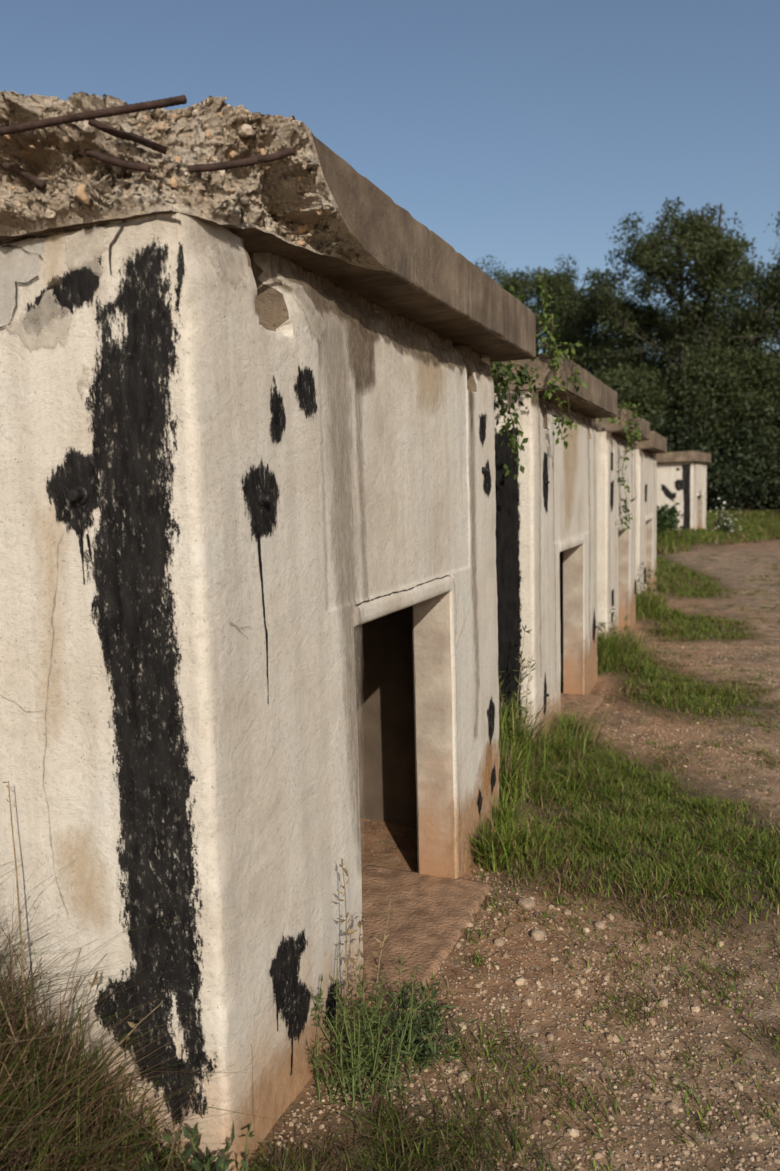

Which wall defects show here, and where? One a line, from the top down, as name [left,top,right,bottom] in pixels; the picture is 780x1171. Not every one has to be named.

spalling [0,95,187,155]
spalling [84,148,151,173]
spalling [188,147,295,174]
crack [0,216,181,329]